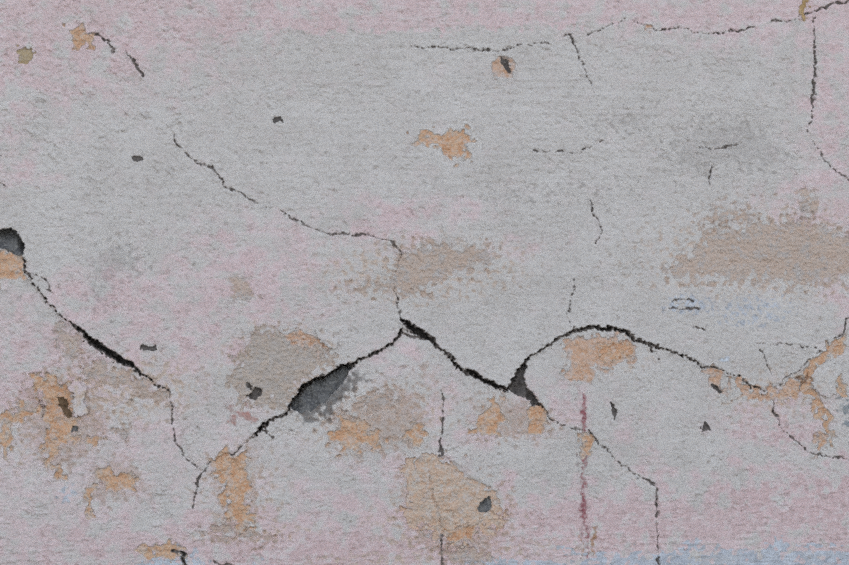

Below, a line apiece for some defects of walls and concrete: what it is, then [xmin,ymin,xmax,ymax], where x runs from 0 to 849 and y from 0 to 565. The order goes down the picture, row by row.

crack [88,32,144,77]
crack [416,0,849,131]
peeling [411,124,476,167]
spalling [0,360,169,480]
crack [23,258,211,508]
peeling [225,321,339,411]
crack [229,279,848,459]
spalling [560,331,637,384]
spalling [701,333,849,459]
crack [171,549,187,565]
spalling [393,421,511,550]
crack [588,429,660,565]